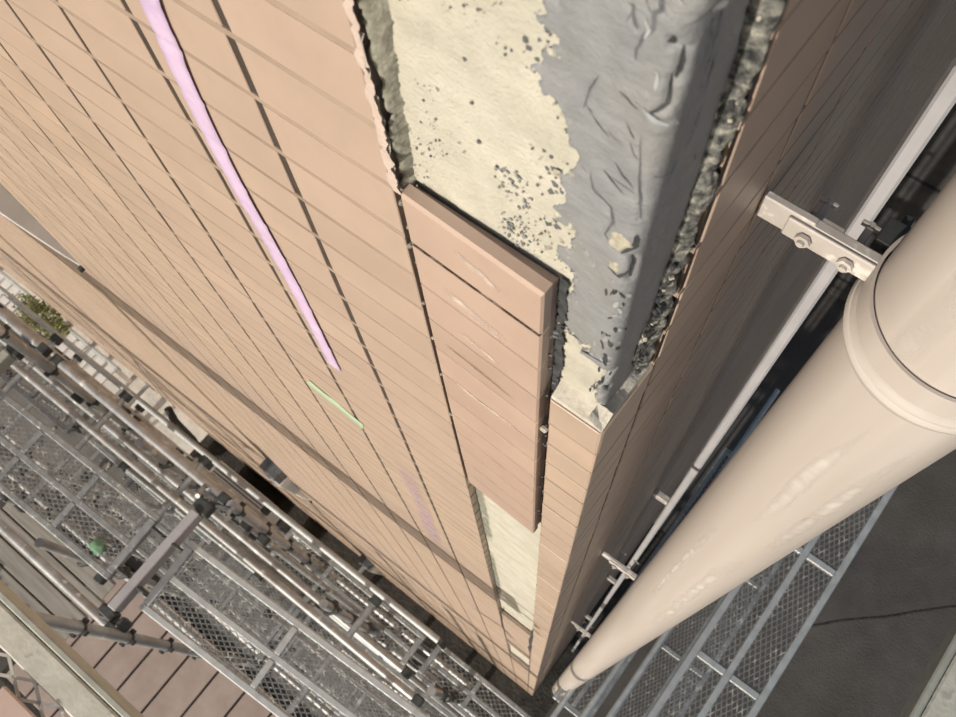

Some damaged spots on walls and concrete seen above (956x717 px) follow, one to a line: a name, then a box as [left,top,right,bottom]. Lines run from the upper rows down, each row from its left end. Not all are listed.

spalling [342,0,401,195]
spalling [388,0,582,307]
spalling [649,45,686,122]
spalling [550,232,640,403]
peeling [635,275,676,375]
spalling [475,488,542,631]